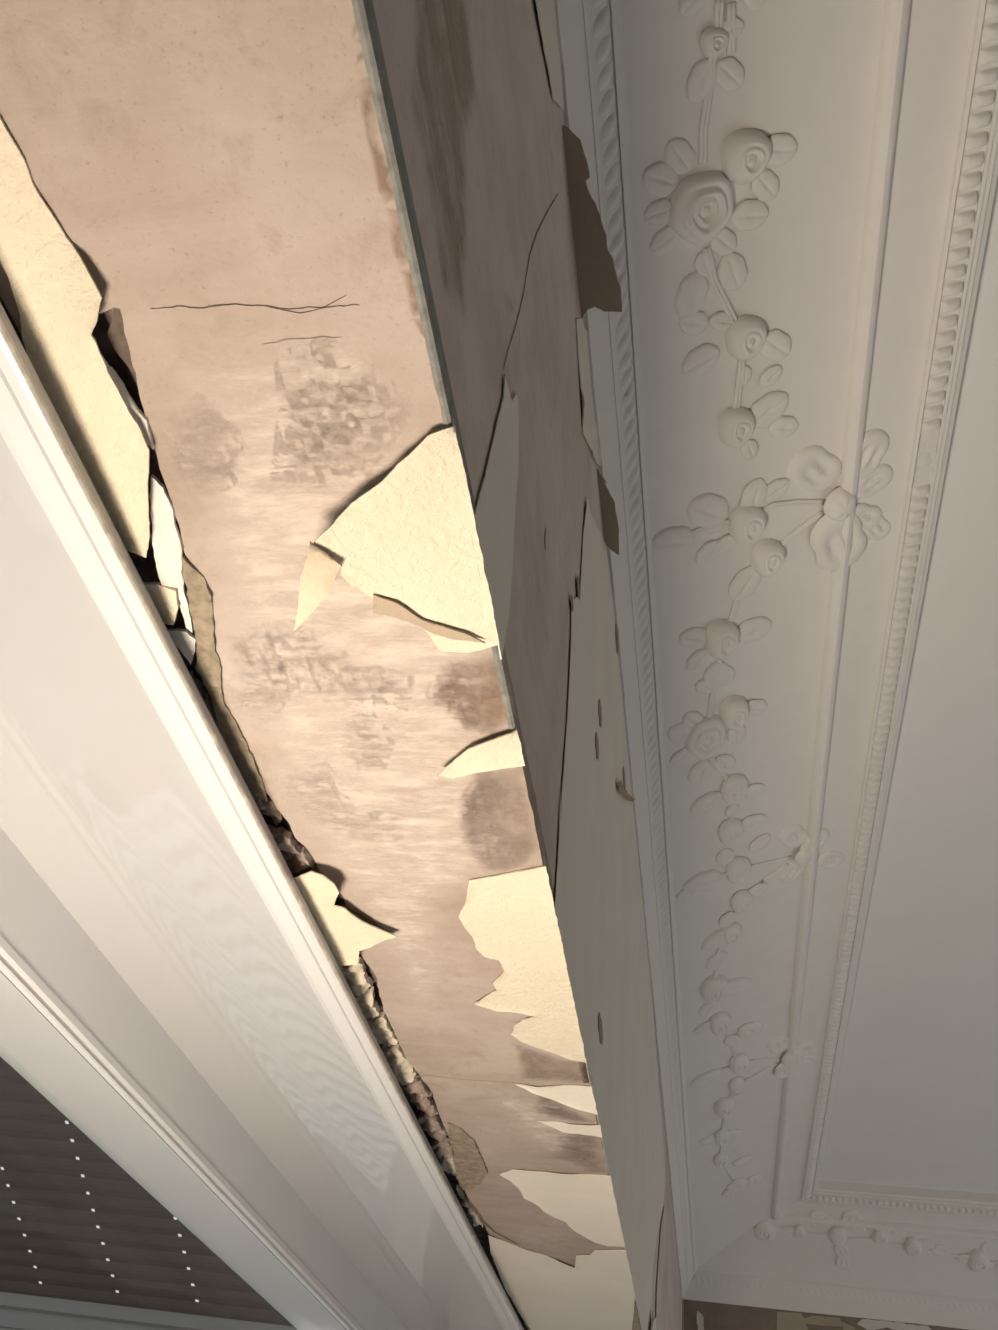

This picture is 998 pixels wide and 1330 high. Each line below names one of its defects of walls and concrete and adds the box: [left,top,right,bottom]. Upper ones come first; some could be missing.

damp [419,0,472,297]
crack [150,296,351,344]
flaking render [340,957,487,1228]